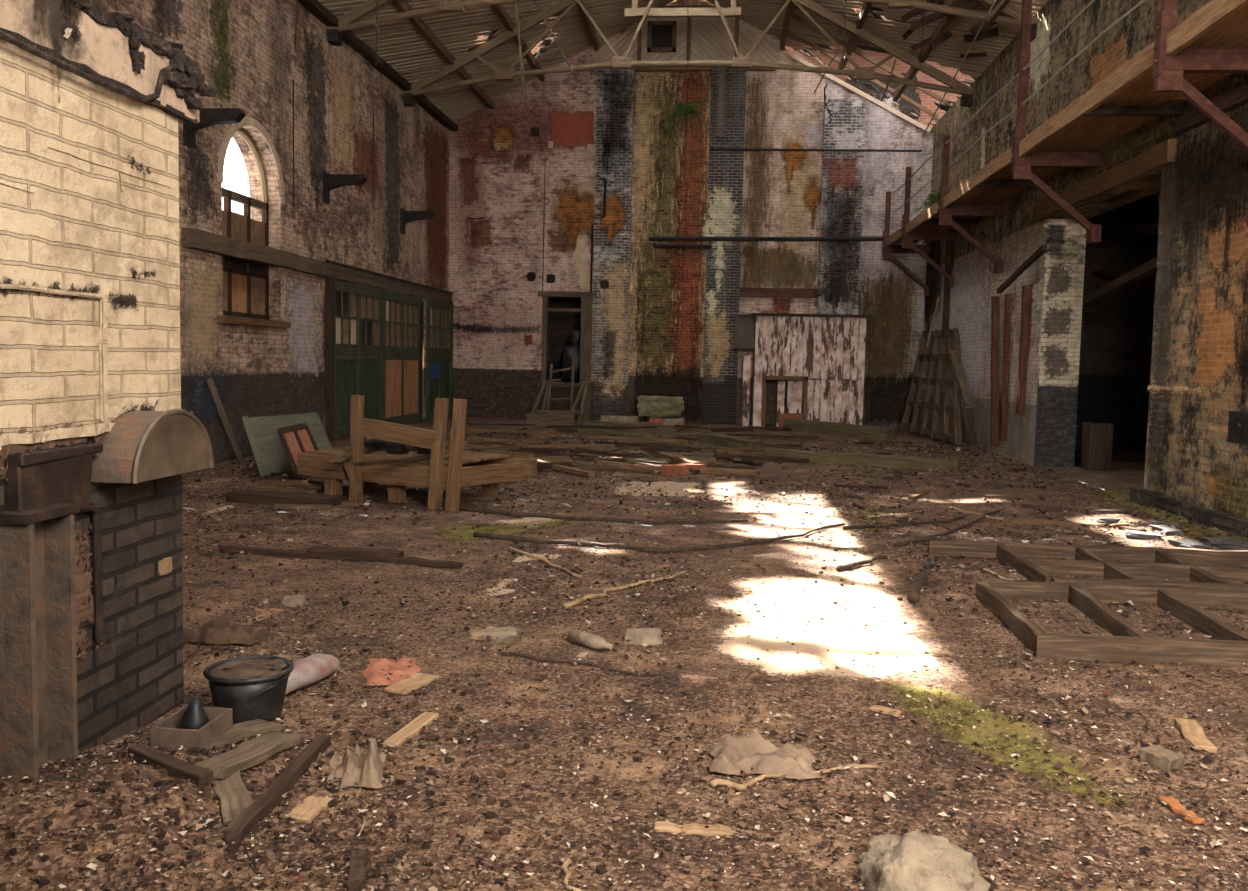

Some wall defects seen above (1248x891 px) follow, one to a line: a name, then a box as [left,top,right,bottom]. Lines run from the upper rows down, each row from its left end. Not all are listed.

spalling [494,142,531,174]
spalling [547,229,571,253]
damp [550,72,635,292]
peeling [598,71,674,398]
damp [633,184,740,422]
damp [777,133,864,314]
damp [1145,103,1248,490]
spalling [1194,215,1248,393]